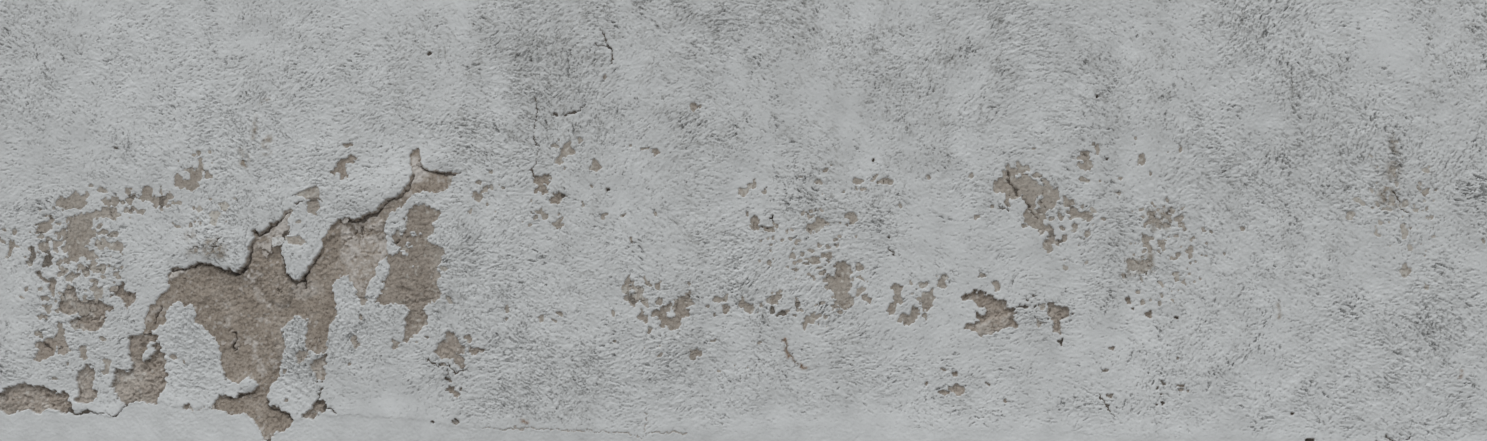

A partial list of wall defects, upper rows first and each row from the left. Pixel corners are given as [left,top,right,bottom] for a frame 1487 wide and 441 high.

peeling [468,170,505,214]
peeling [842,159,894,193]
peeling [974,148,1106,270]
peeling [1073,142,1122,195]
spalling [0,143,485,440]
peeling [611,165,949,360]
spalling [961,273,1018,337]
spalling [1036,303,1069,346]
peeling [1121,198,1226,319]